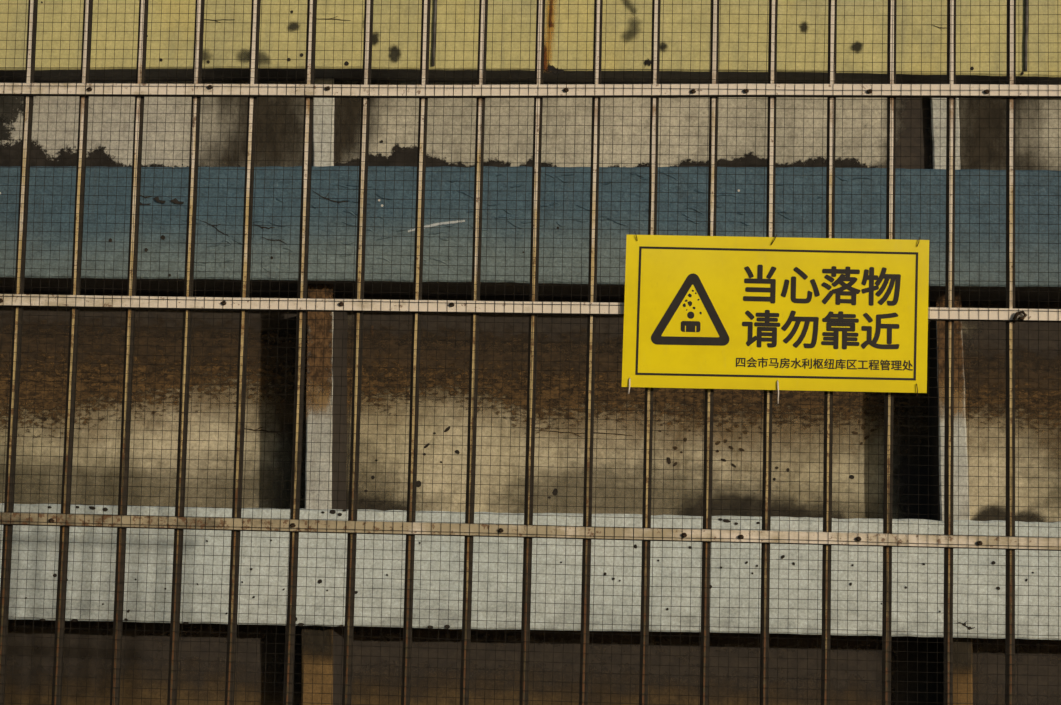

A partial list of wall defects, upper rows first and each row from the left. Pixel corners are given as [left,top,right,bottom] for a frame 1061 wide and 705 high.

rust [544,0,554,71]
leakage [624,0,638,40]
leakage [0,96,36,143]
leakage [201,97,313,167]
leakage [928,297,1061,309]
leakage [0,284,624,509]
leakage [346,312,1061,522]